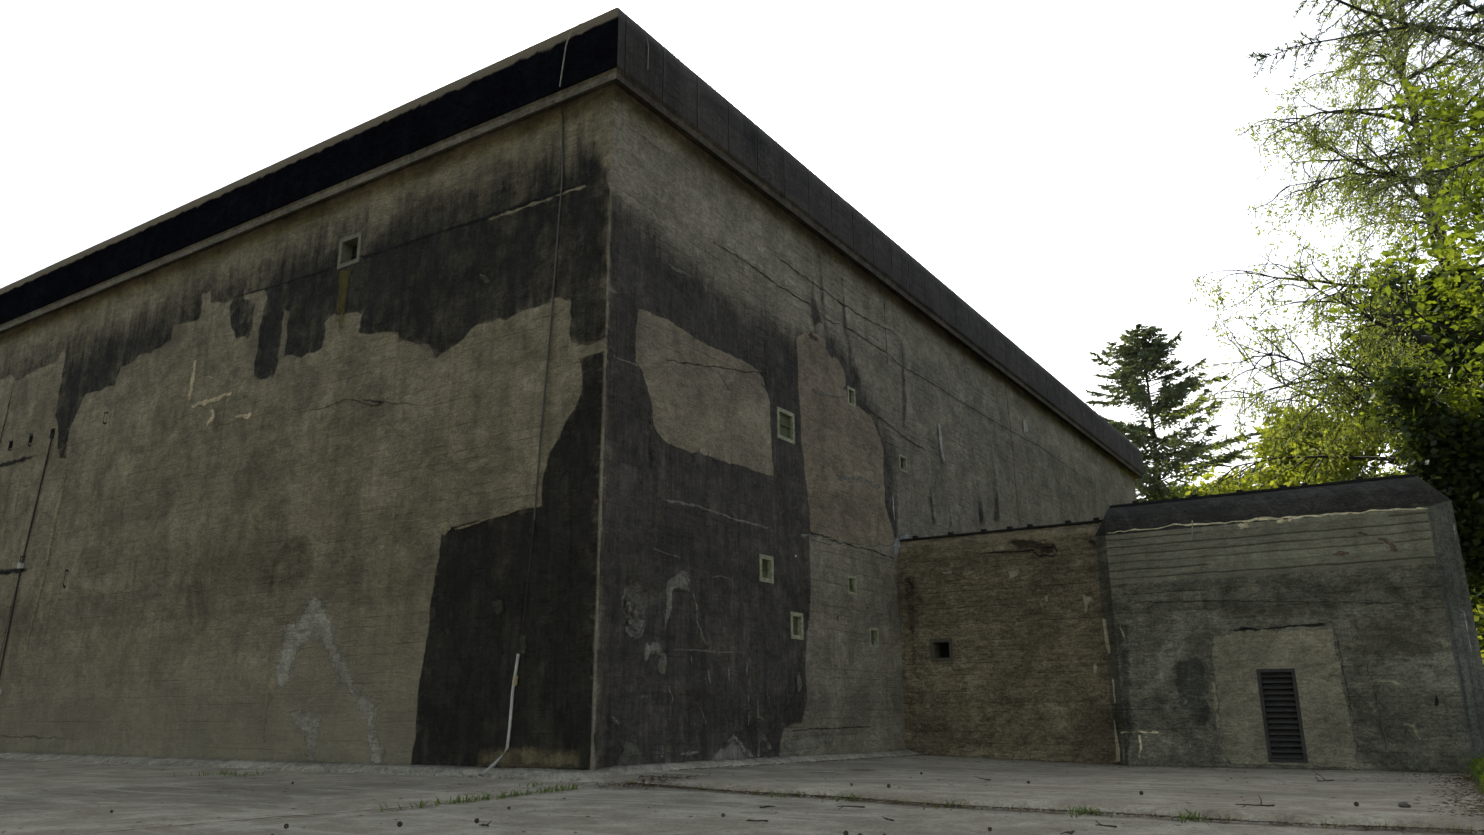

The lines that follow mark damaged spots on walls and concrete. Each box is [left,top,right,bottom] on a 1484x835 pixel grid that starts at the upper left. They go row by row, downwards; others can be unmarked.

peeling [7,144,1428,770]
efflorescence [665,571,702,632]
efflorescence [267,593,385,764]
efflorescence [644,641,667,668]
crack [1136,600,1406,745]
damp [608,742,646,766]
damp [681,696,770,760]